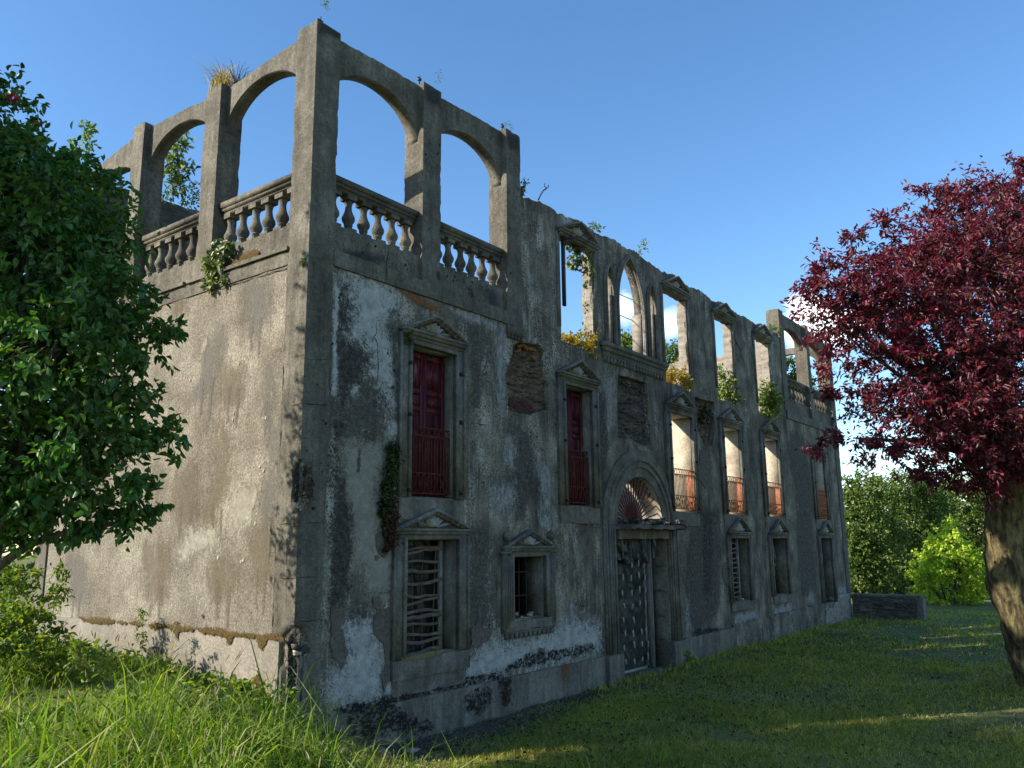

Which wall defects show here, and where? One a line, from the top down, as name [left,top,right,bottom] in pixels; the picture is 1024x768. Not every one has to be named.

leakage [328,272,399,472]
leakage [141,329,246,623]
leakage [206,366,281,627]
leakage [325,461,355,612]
peeling [330,608,349,669]
peeling [373,597,392,698]